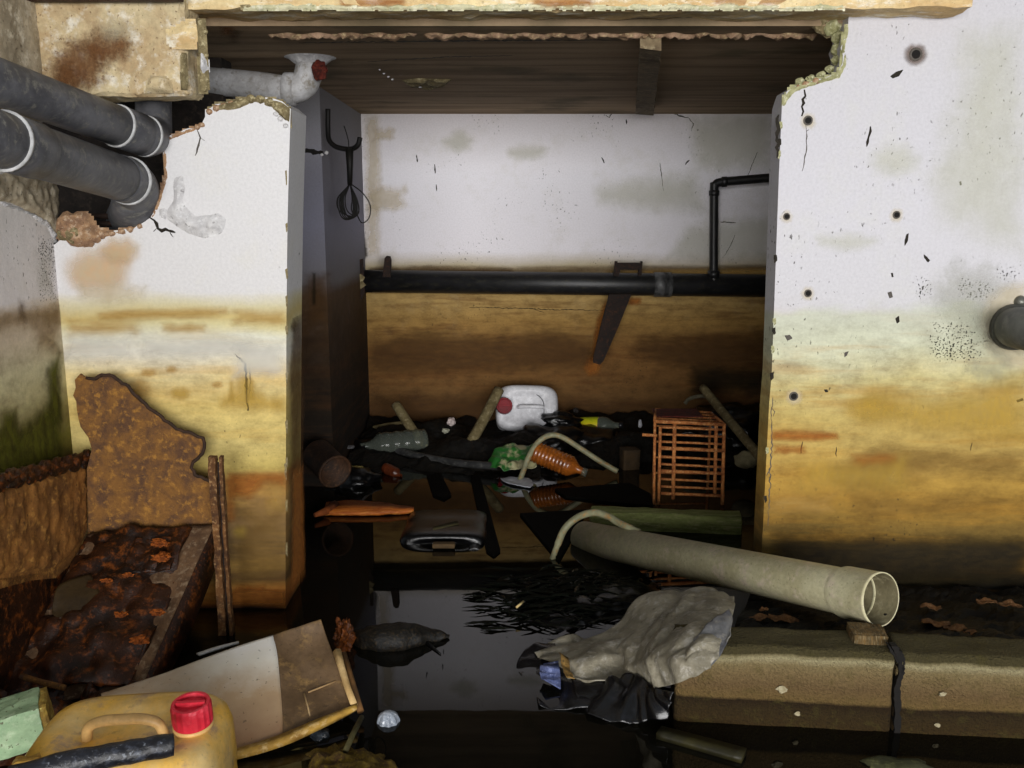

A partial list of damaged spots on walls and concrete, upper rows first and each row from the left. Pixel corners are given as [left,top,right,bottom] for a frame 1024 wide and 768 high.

rust [53,32,128,88]
peeling [240,3,848,159]
spalling [143,18,292,217]
crack [800,90,808,171]
peeling [0,173,143,247]
crack [150,217,175,237]
mould [930,318,982,366]
leakage [48,359,62,422]
crack [235,354,251,411]
leakage [292,322,305,586]
leakage [774,432,836,453]
leakage [776,538,1024,581]